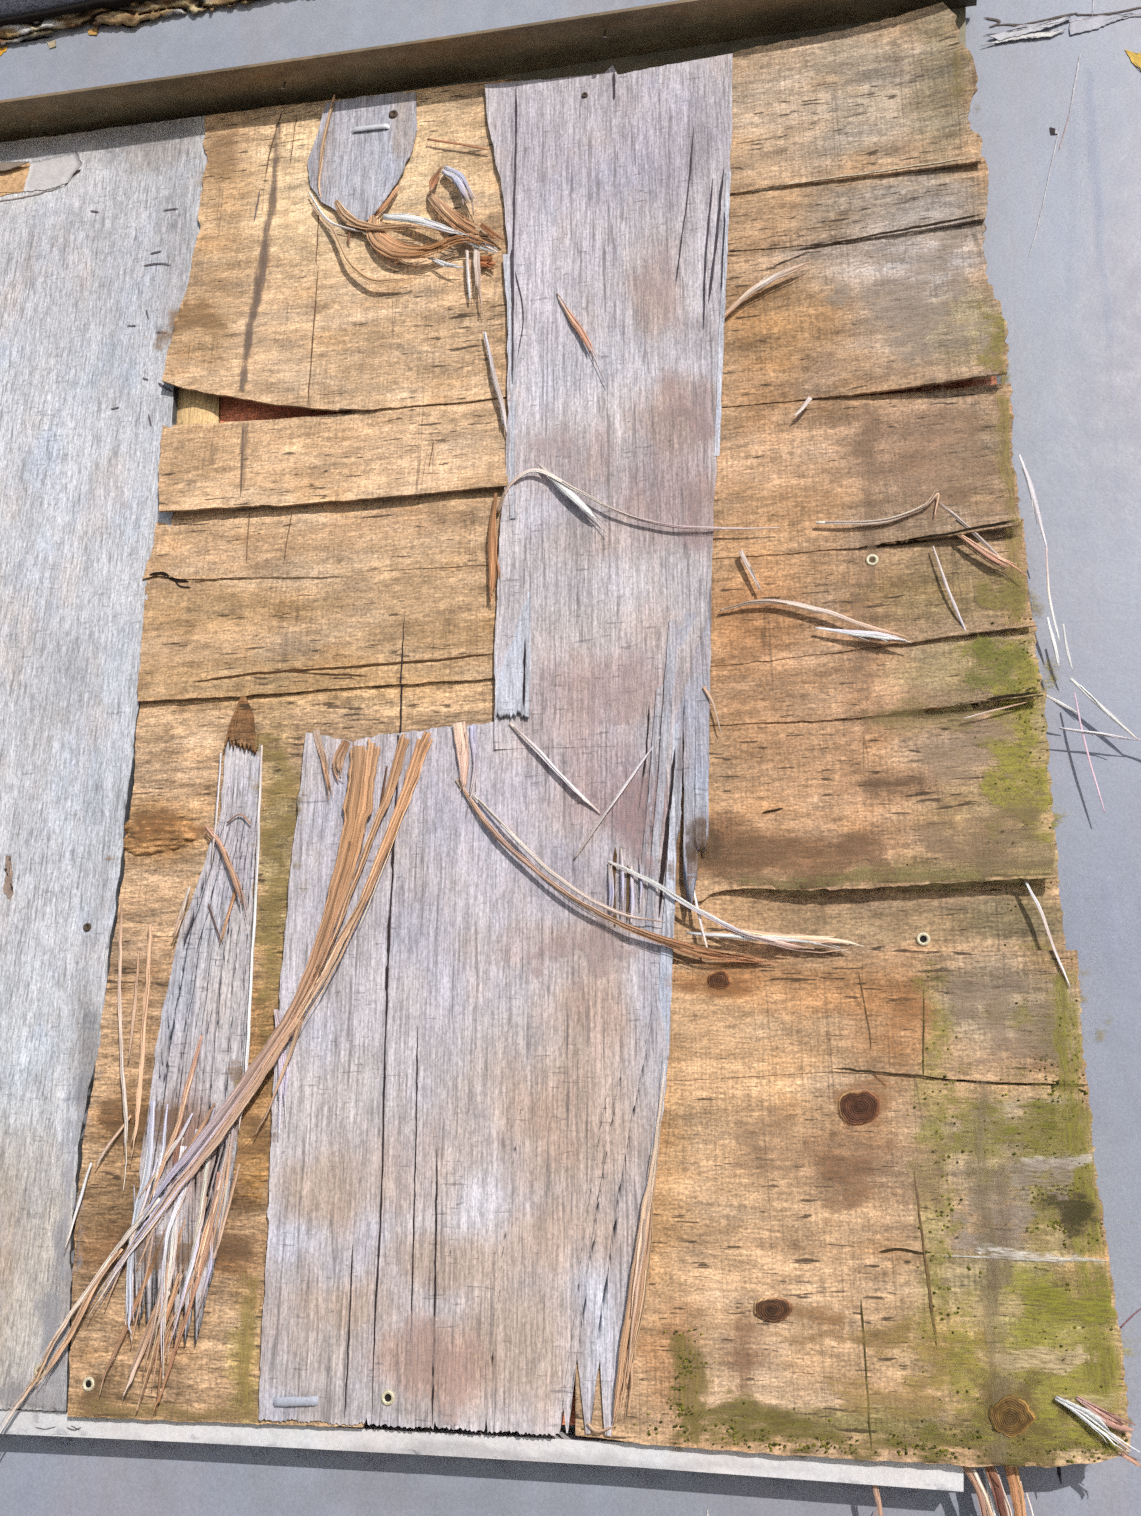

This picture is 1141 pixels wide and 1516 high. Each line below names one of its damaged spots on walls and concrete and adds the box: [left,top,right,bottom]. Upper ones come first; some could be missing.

crack [610,72,618,99]
crack [676,128,983,323]
crack [192,617,526,743]
crack [837,974,1085,1087]
crack [345,782,438,1426]
damp [1022,1154,1092,1169]
crack [880,1169,1108,1351]
damp [977,1244,1097,1262]
crack [861,1299,872,1449]
damp [993,1345,1098,1375]